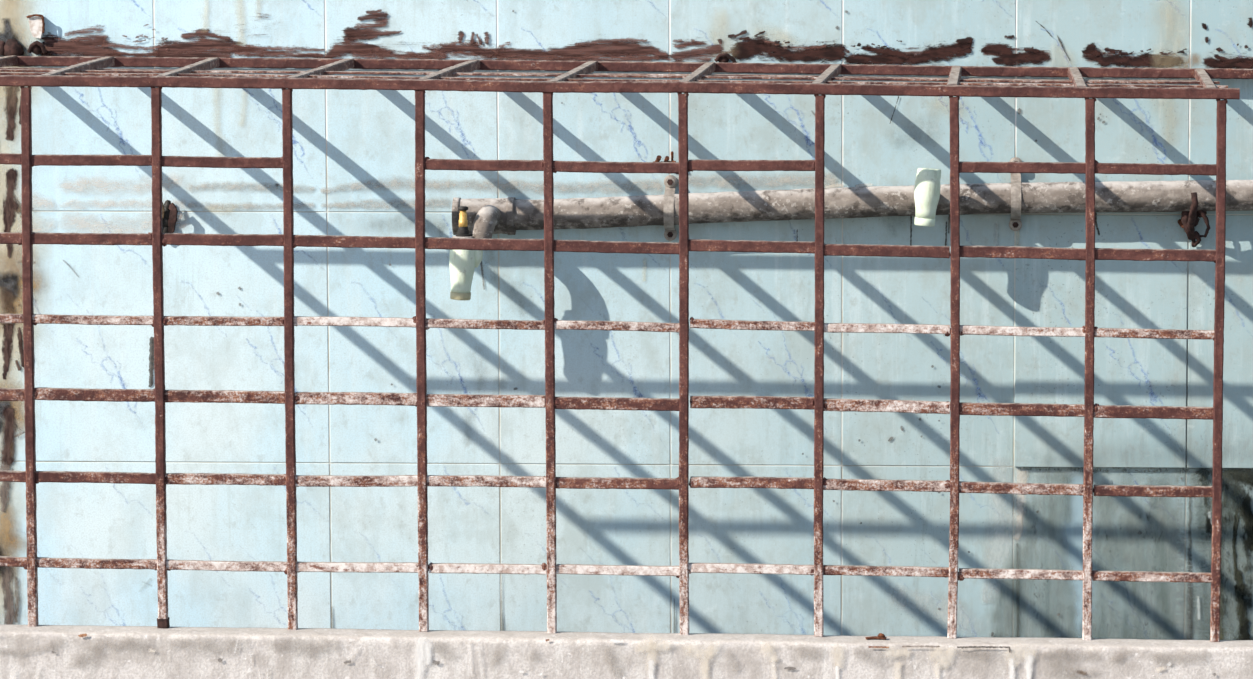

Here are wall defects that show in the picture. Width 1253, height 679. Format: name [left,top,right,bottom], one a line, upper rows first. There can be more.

corrosion [0,0,45,57]
corrosion [0,244,39,325]
corrosion [0,401,25,624]
damp [1067,468,1127,638]
damp [1144,468,1253,640]